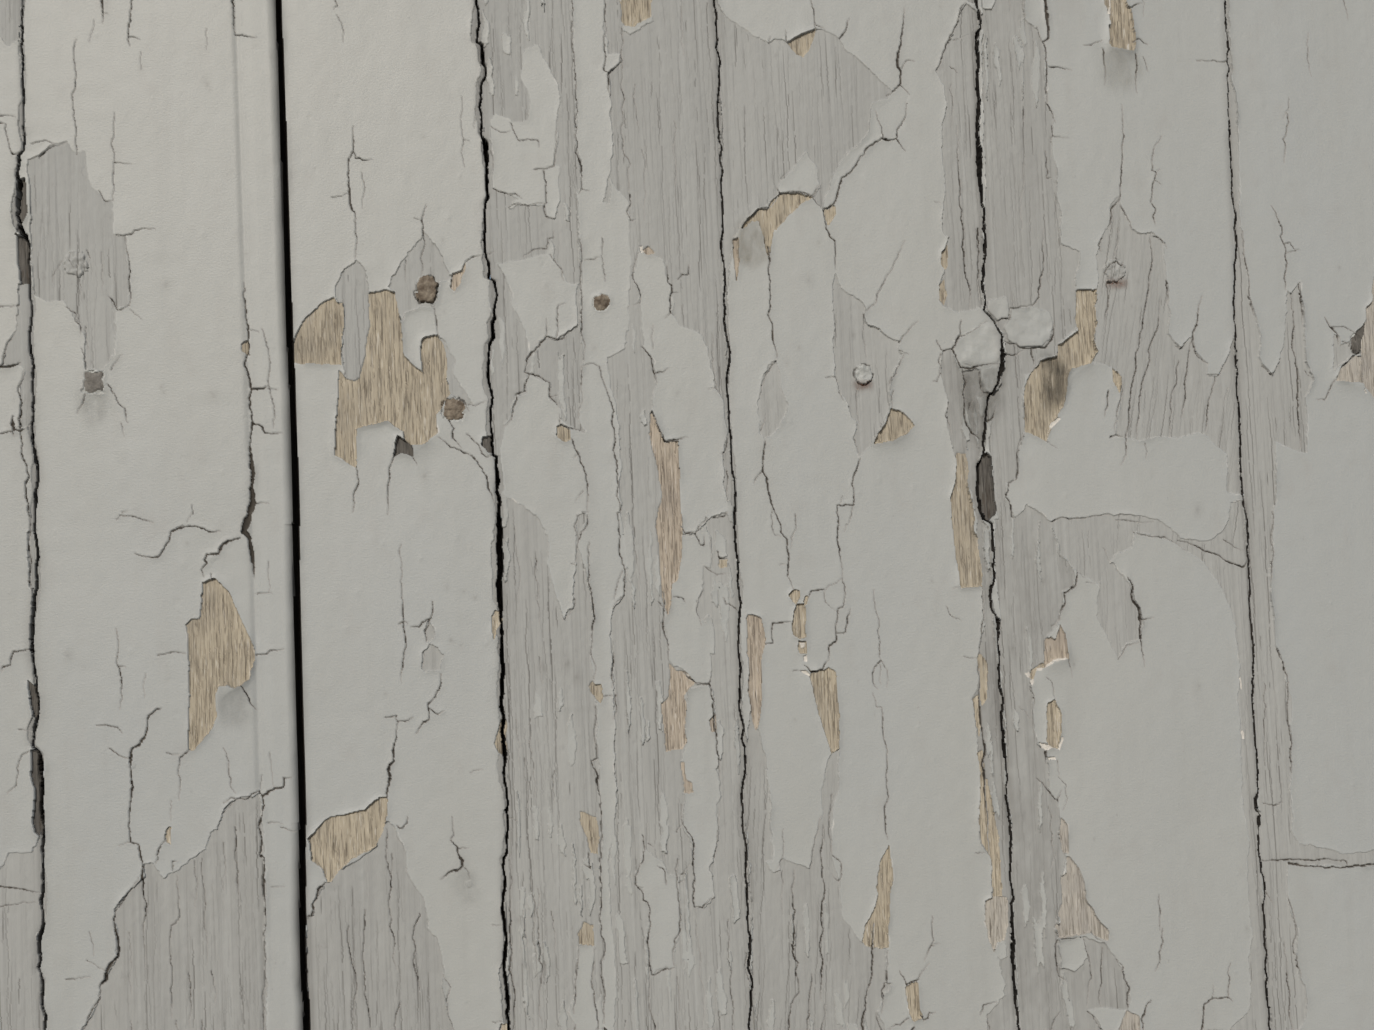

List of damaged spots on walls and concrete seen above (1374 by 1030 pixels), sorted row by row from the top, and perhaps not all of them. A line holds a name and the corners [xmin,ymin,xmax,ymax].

peeling [0,0,133,626]
crack [0,0,142,202]
crack [52,227,156,437]
crack [116,282,284,595]
peeling [184,577,257,753]
crack [331,127,374,259]
peeling [293,0,925,1030]
crack [347,0,1233,1030]
peeling [936,0,1374,1030]
crack [1051,511,1275,667]
peeling [81,792,270,1030]
crack [66,628,326,1030]